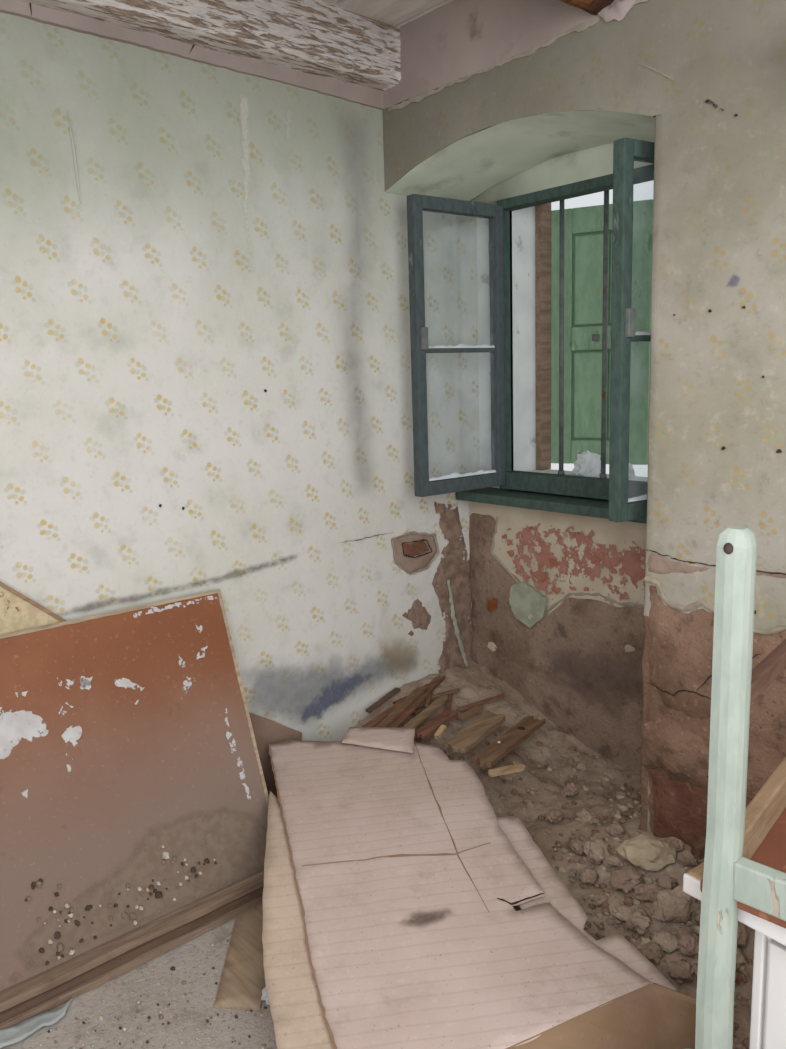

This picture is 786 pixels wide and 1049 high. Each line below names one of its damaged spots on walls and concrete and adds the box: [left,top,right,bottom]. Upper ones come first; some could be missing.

flaking render [596,0,635,23]
flaking render [756,570,786,578]
flaking render [752,626,786,669]
leakage [255,660,399,720]
flaking render [391,501,716,847]
crack [646,675,712,699]
flaking render [746,668,786,807]